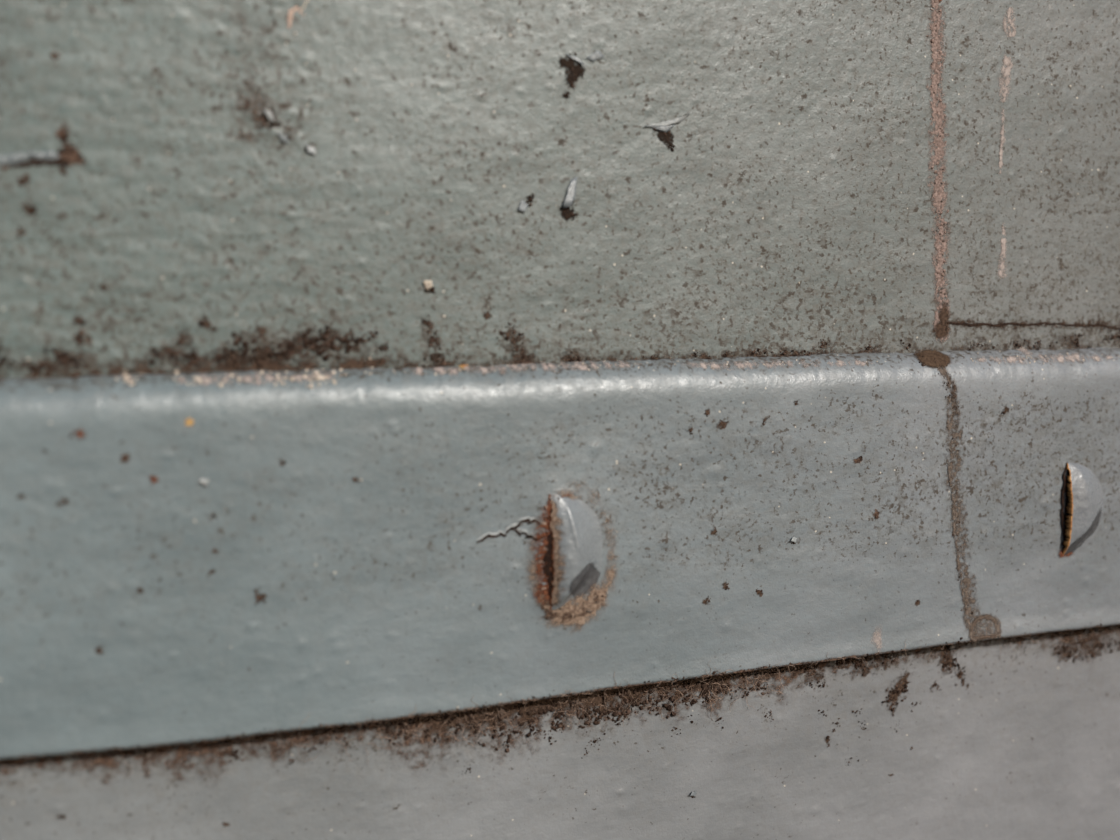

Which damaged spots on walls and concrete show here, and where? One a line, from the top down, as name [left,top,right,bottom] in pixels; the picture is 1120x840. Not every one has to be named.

peeling [559,51,604,98]
peeling [0,126,85,171]
peeling [644,111,693,151]
corrosion [926,0,950,341]
corrosion [22,203,37,215]
peeling [518,193,534,213]
peeling [560,177,579,220]
corrosion [198,316,217,332]
crack [946,319,1120,332]
crack [477,494,572,605]
corrosion [0,349,1120,783]